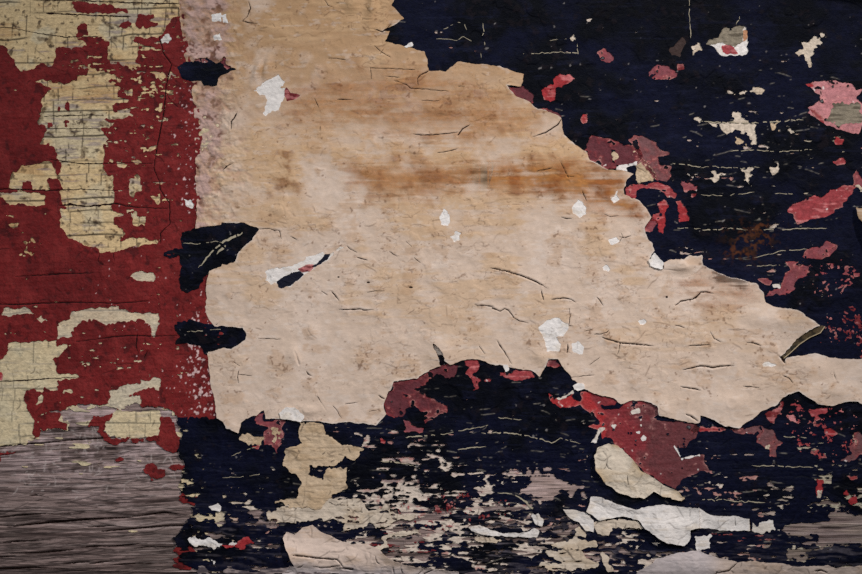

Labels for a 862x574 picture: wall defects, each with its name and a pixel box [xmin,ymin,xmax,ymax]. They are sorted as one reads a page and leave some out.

crack [0,36,184,244]
peeling [0,0,259,293]
peeling [385,0,862,367]
peeling [0,306,160,446]
peeling [88,317,862,574]